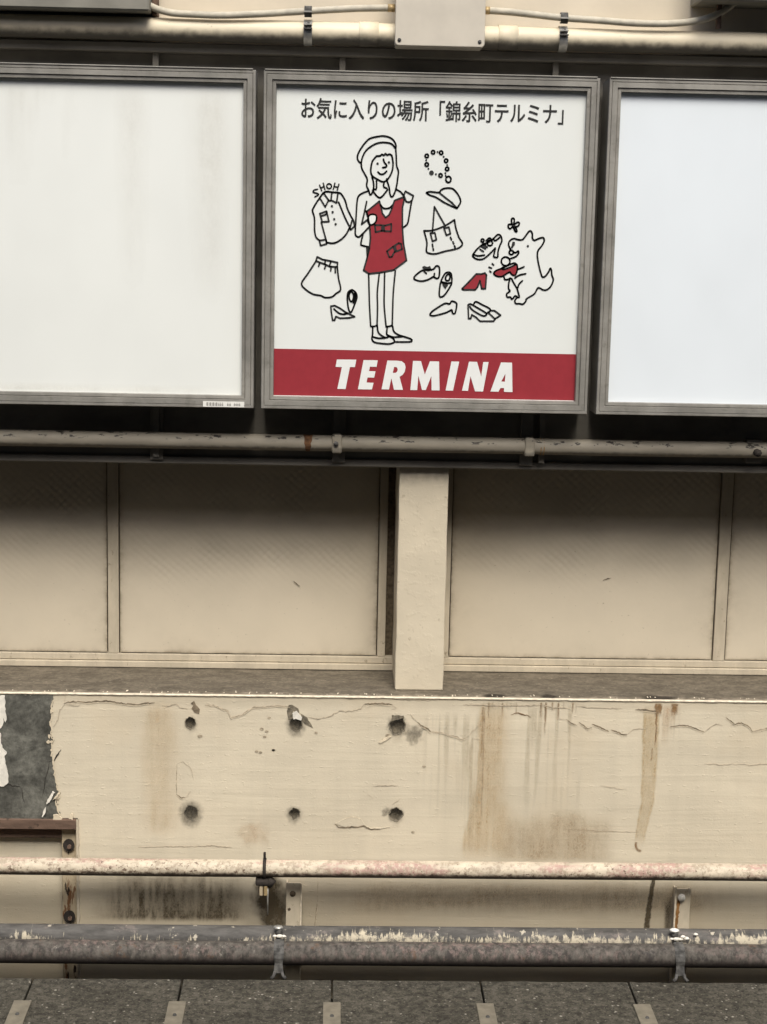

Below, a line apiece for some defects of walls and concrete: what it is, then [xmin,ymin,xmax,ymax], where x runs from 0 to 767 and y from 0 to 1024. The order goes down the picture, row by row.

spalling [270,692,318,734]
crack [53,699,767,741]
corrosion [643,704,678,743]
peeling [0,690,73,820]